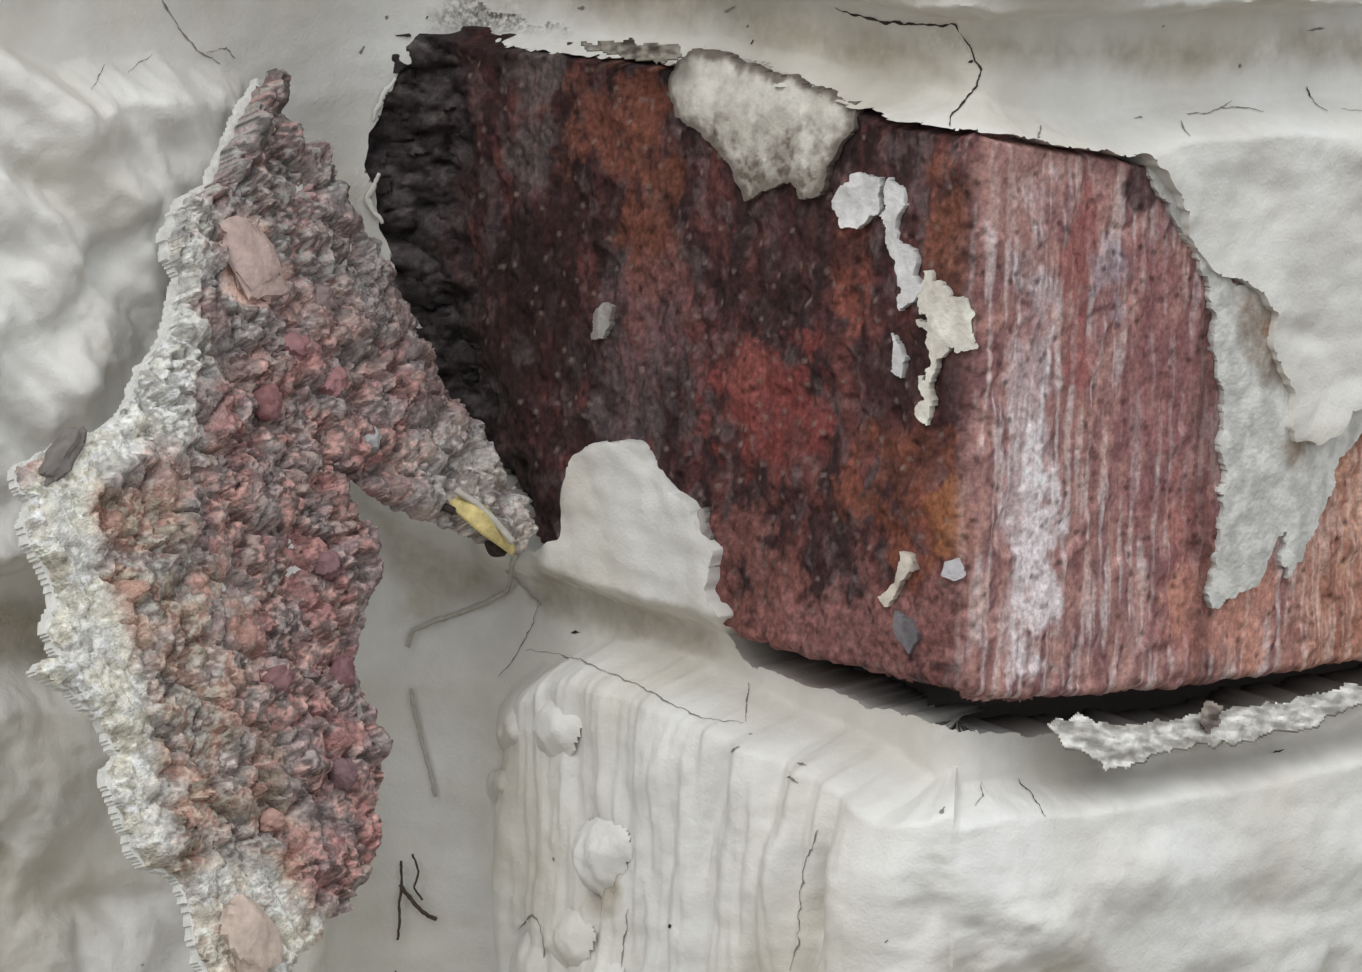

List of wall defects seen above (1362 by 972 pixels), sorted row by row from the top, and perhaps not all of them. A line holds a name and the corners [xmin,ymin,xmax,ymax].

crack [162,0,235,64]
crack [835,7,982,125]
spalling [364,26,1362,702]
corrosion [1256,316,1271,338]
peeling [7,68,538,972]
crack [498,605,749,723]
spalling [1047,683,1362,773]